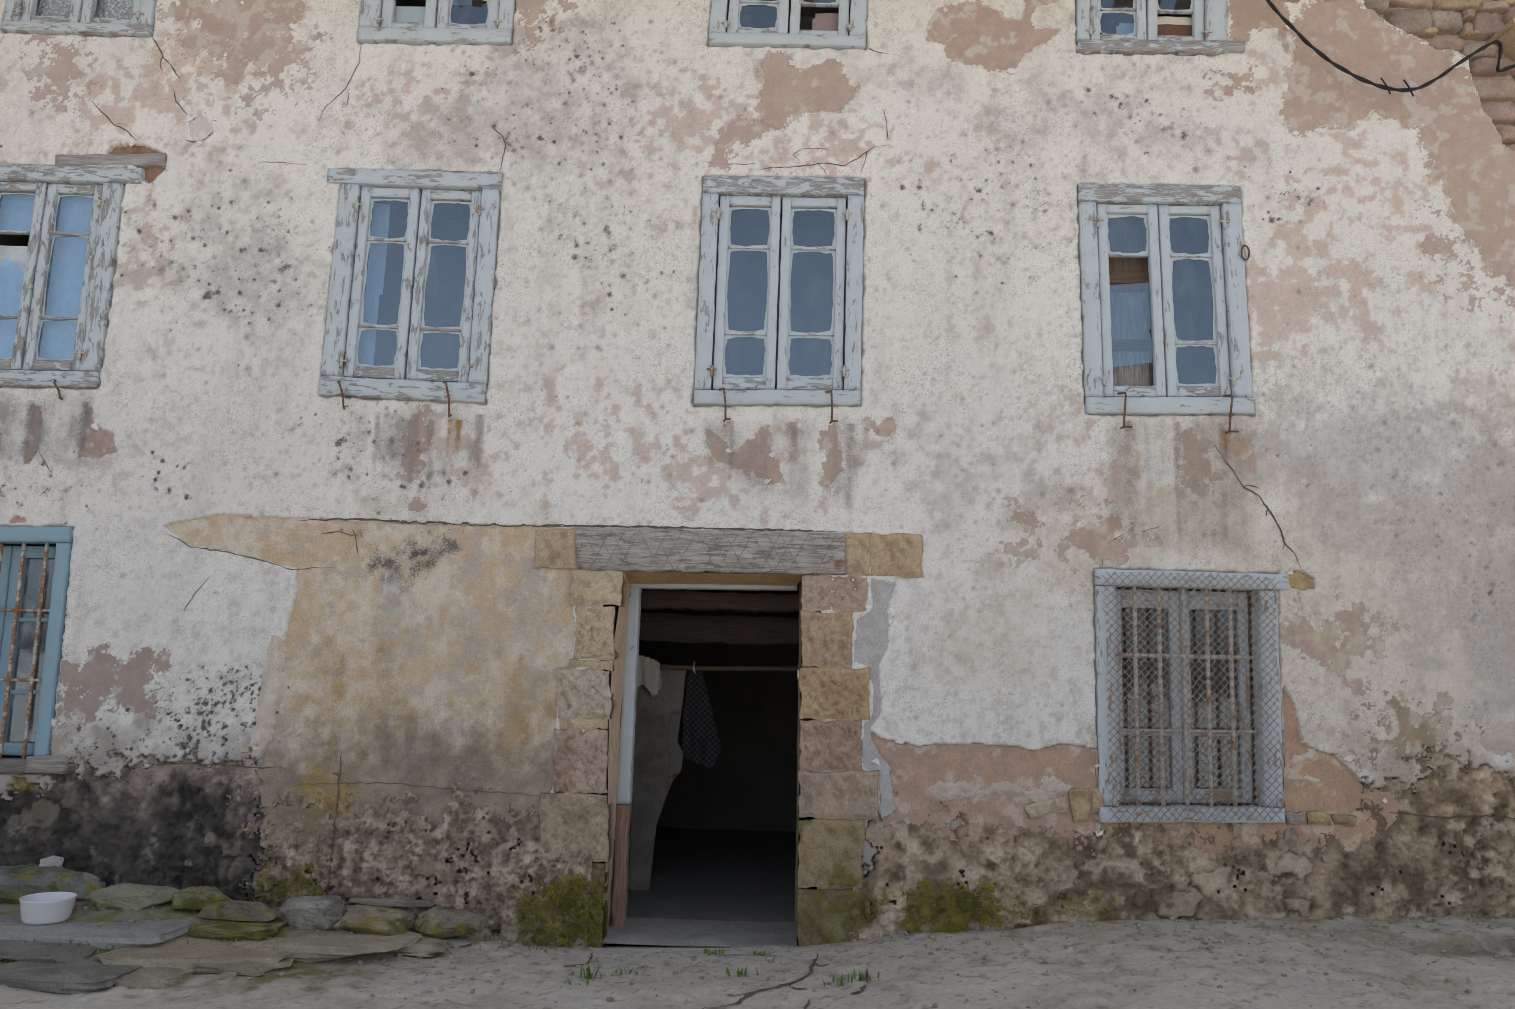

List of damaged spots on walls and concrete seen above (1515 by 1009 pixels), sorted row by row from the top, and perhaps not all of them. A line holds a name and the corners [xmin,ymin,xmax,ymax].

crack [319,47,361,121]
peeling [513,0,579,62]
peeling [709,50,860,172]
peeling [927,0,1060,75]
peeling [1228,0,1515,324]
crack [1211,441,1303,571]
damp [64,664,262,795]
peeling [0,404,592,947]
spalling [845,569,1515,942]